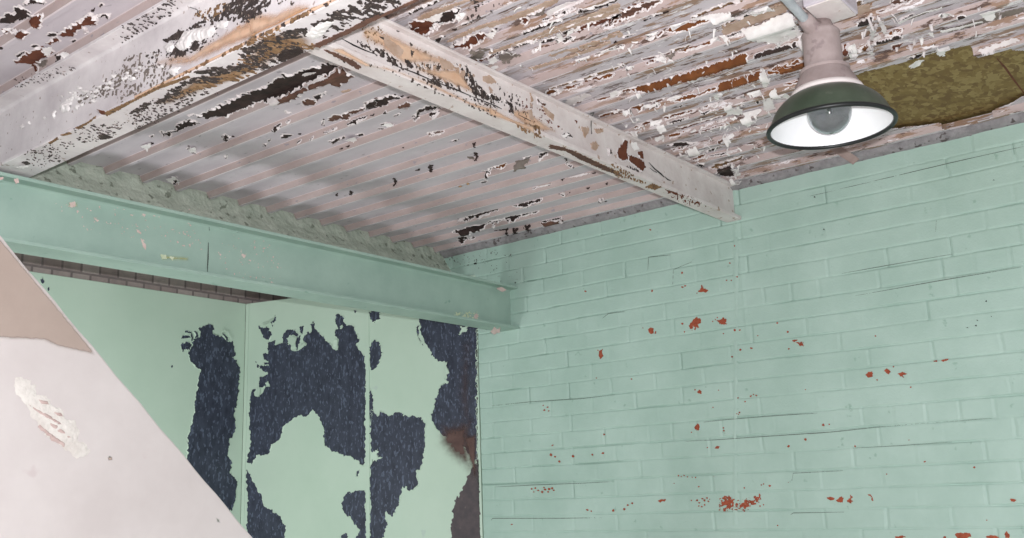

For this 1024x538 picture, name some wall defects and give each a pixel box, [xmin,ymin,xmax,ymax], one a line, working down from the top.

peeling [0,0,805,186]
peeling [451,158,596,245]
spalling [681,317,741,334]
peeling [180,310,481,538]
corrosion [444,408,480,527]
spalling [673,475,771,512]